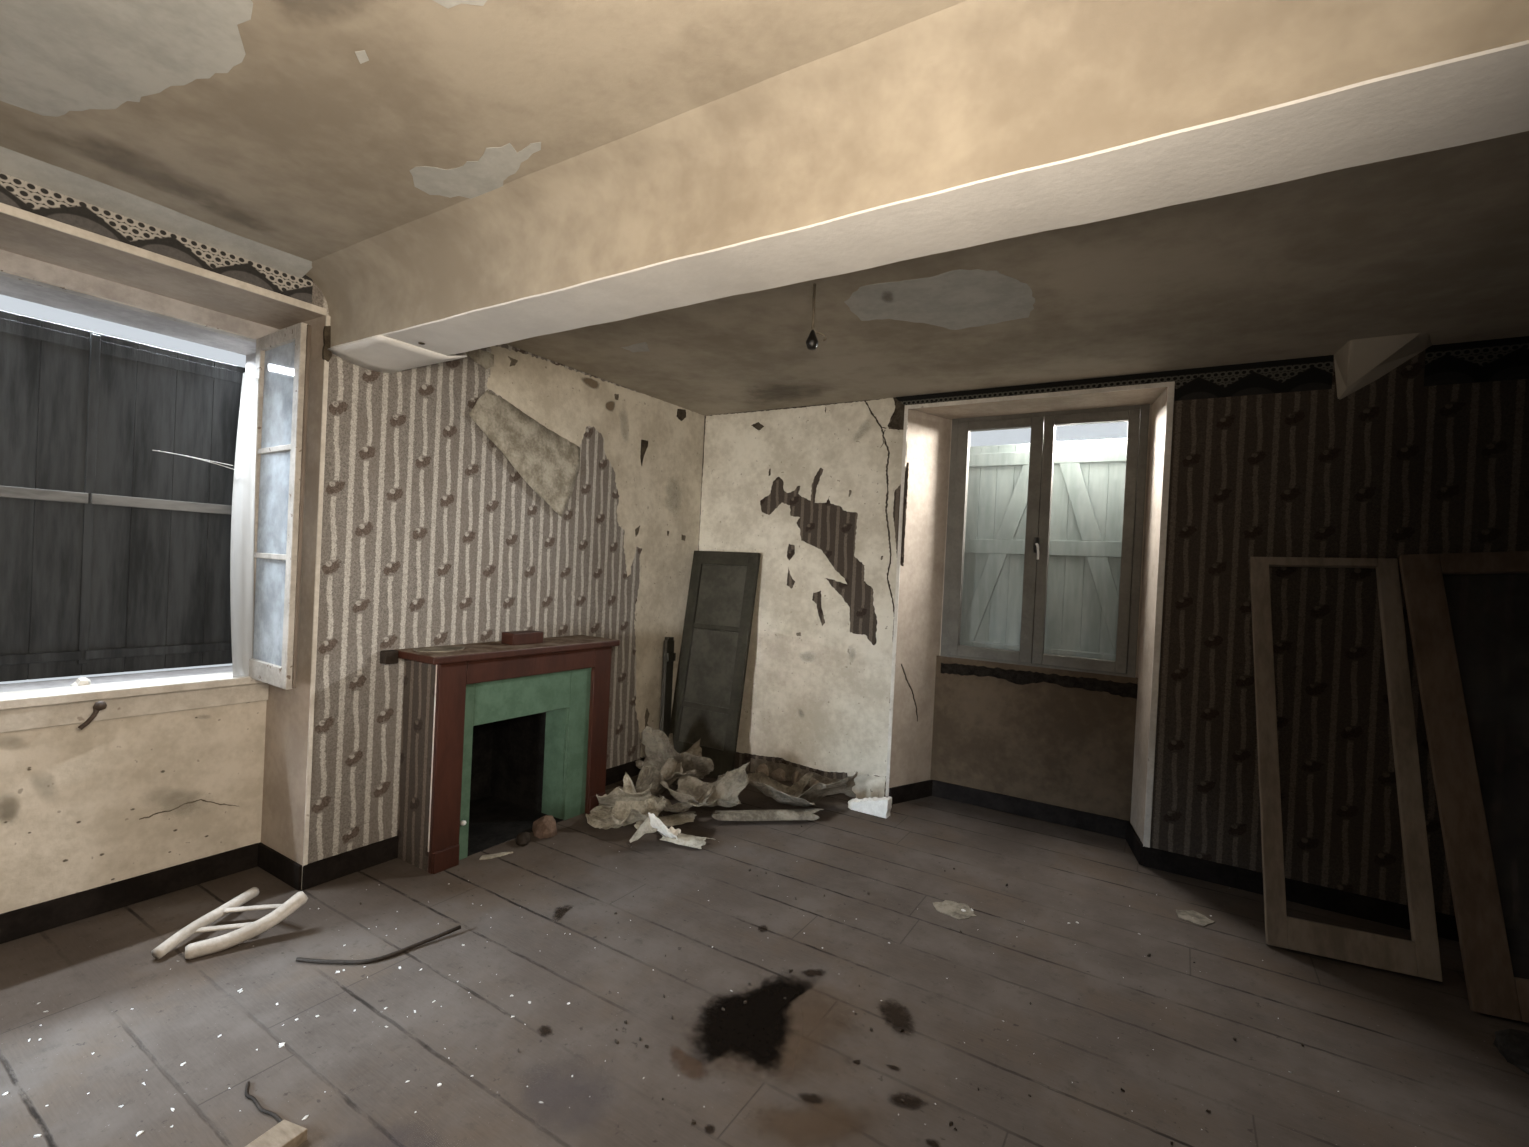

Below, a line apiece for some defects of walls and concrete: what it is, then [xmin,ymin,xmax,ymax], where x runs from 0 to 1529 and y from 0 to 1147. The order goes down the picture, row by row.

peeling [0,0,253,117]
peeling [355,50,369,64]
peeling [409,142,541,199]
peeling [844,269,1035,330]
peeling [465,346,909,799]
crack [864,400,918,721]